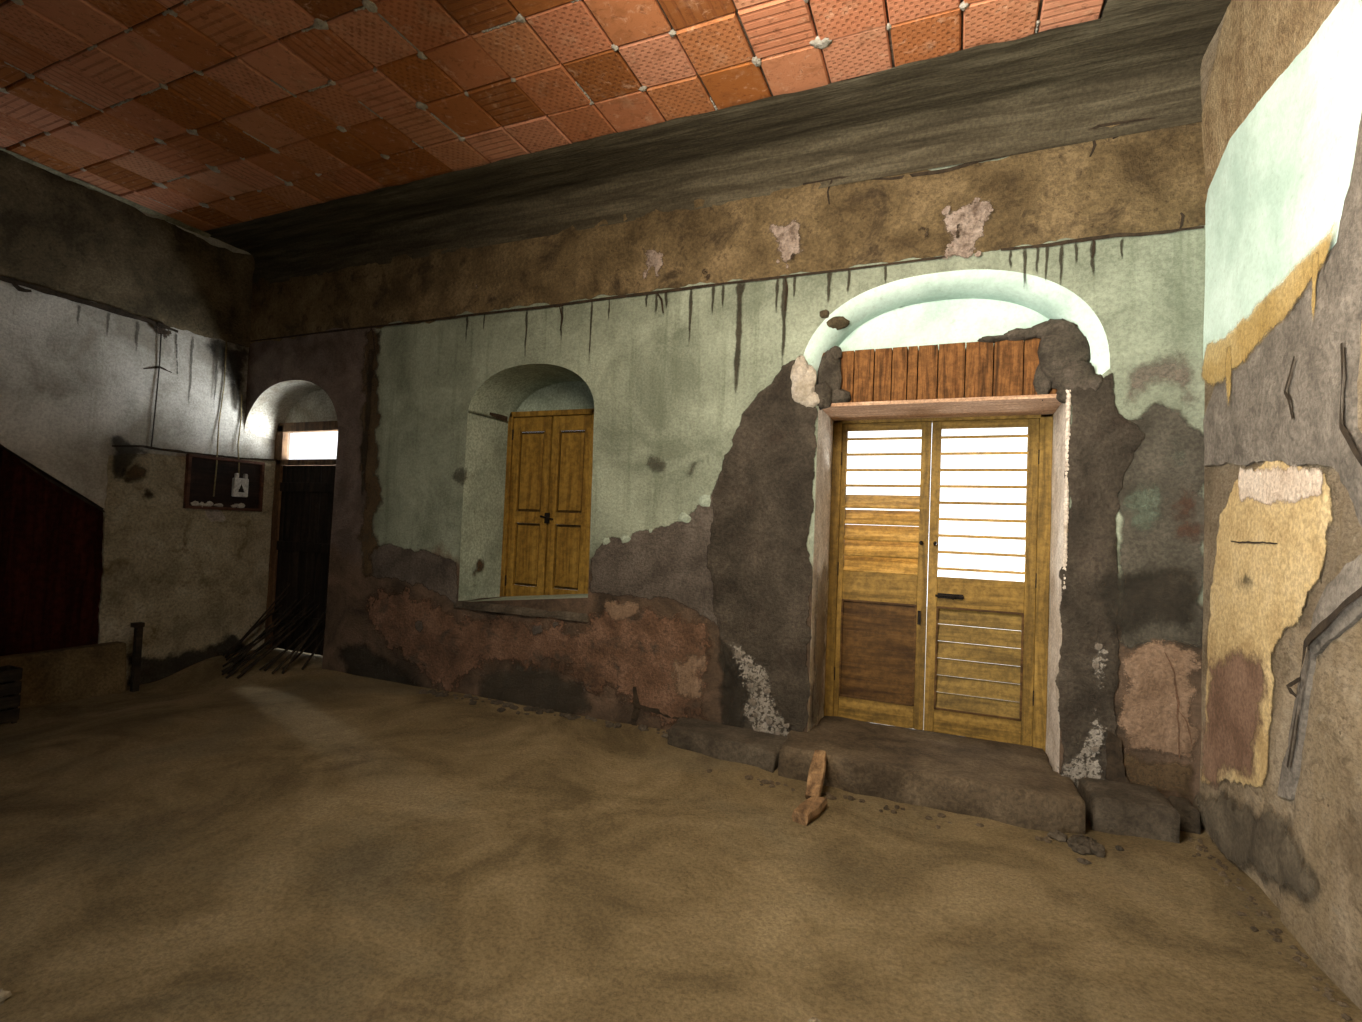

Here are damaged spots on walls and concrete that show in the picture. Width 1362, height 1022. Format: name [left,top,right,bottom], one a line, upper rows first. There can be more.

flaking render [0,0,1340,347]
leakage [1009,241,1095,284]
leakage [175,334,250,419]
leakage [711,283,745,390]
leakage [775,276,796,356]
spalling [790,355,820,408]
peeling [1130,359,1190,399]
peeling [360,477,719,728]
leakage [718,639,790,736]
leakage [1058,708,1107,788]
peeling [1105,639,1202,784]